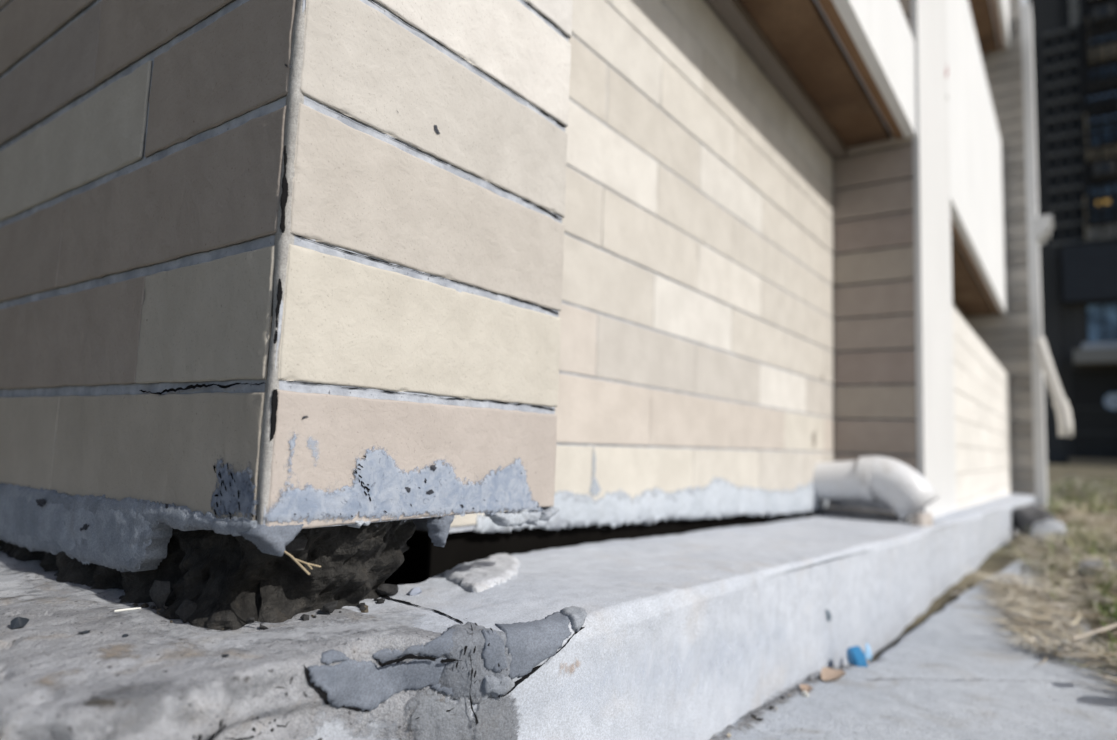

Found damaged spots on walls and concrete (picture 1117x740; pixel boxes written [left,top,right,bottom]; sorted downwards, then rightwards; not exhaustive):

crack [280,145,558,314]
crack [273,278,283,344]
crack [140,381,555,440]
peeling [307,628,468,712]
peeling [481,606,587,696]